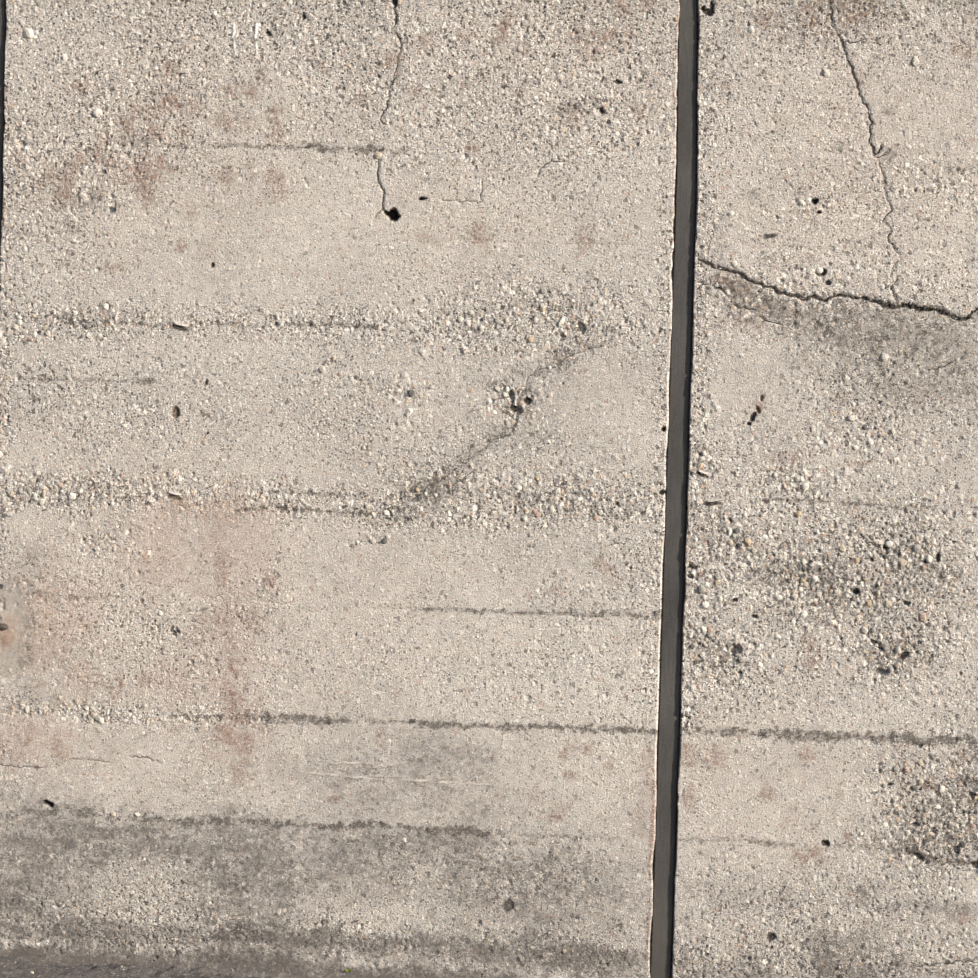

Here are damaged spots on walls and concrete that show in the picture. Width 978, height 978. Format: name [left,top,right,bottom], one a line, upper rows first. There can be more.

crack [380,5,402,125]
crack [374,159,387,218]
crack [697,2,978,325]